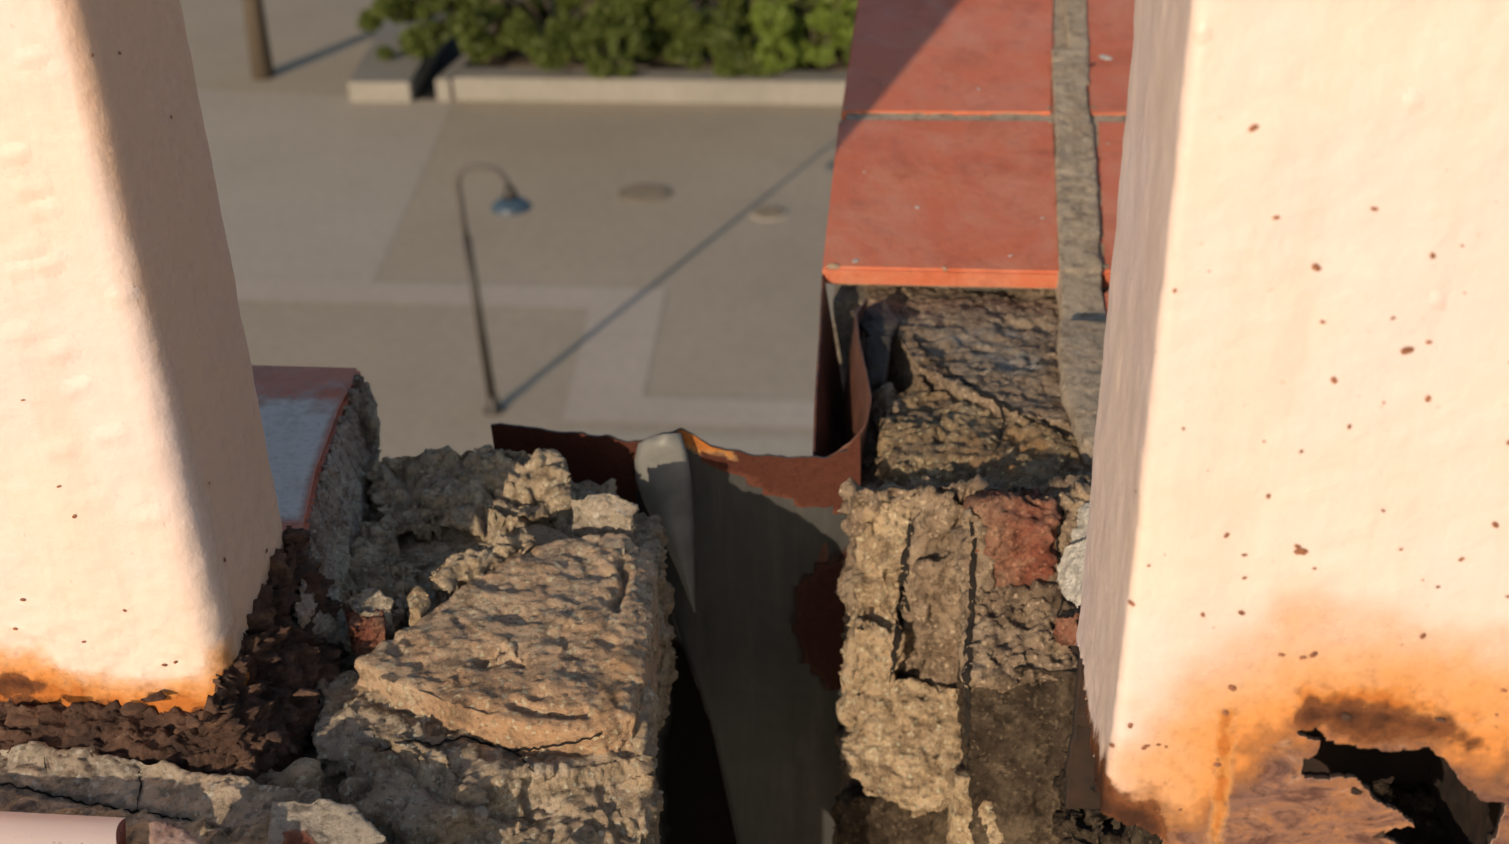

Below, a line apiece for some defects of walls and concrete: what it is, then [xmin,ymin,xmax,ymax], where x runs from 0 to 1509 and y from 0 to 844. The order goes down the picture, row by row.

corrosion [0,0,284,714]
corrosion [674,430,861,515]
corrosion [1293,544,1316,570]
corrosion [791,550,847,691]
peeling [120,690,167,716]
corrosion [1082,617,1509,844]
spalling [1368,780,1452,844]